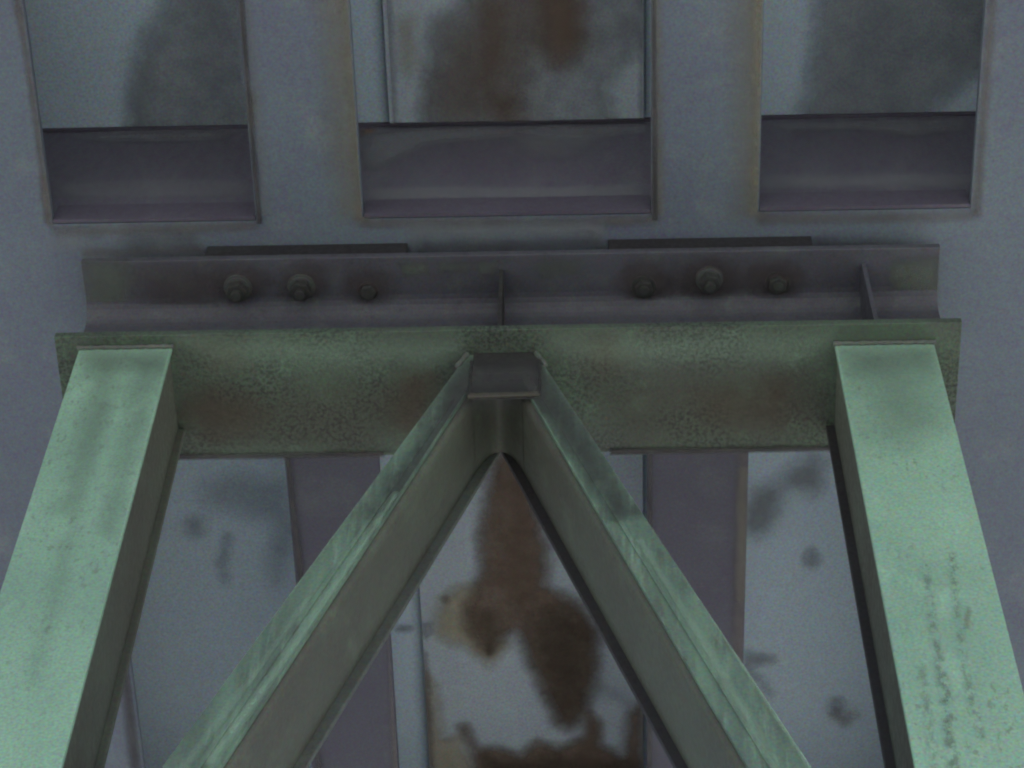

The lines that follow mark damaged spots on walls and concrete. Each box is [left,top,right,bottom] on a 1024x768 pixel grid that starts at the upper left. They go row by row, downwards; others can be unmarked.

corrosion [424,0,657,220]
corrosion [427,455,643,768]